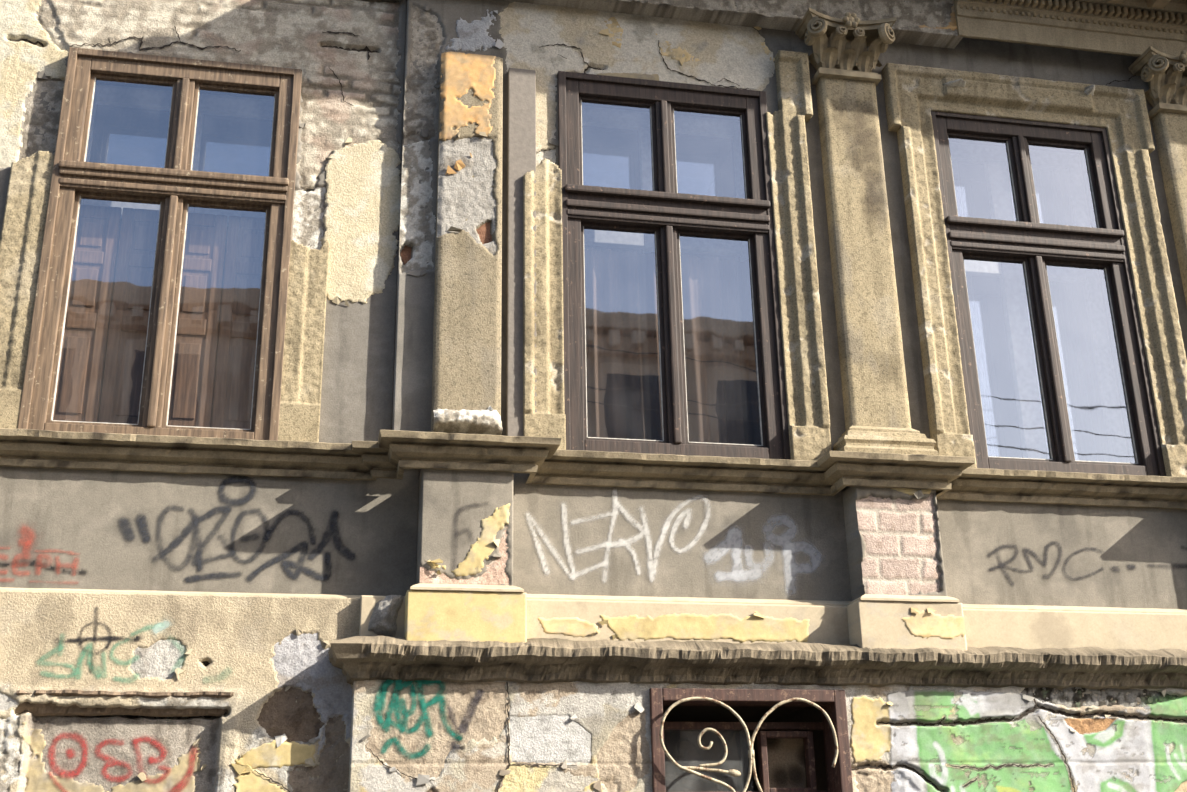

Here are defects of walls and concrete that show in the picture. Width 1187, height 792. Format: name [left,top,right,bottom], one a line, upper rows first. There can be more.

crack [539,44,604,73]
crack [658,40,749,89]
flaking render [0,0,953,306]
spalling [130,639,193,680]
peeling [538,611,810,643]
peeling [0,693,207,792]
spalling [231,628,650,792]
crack [851,698,1186,792]